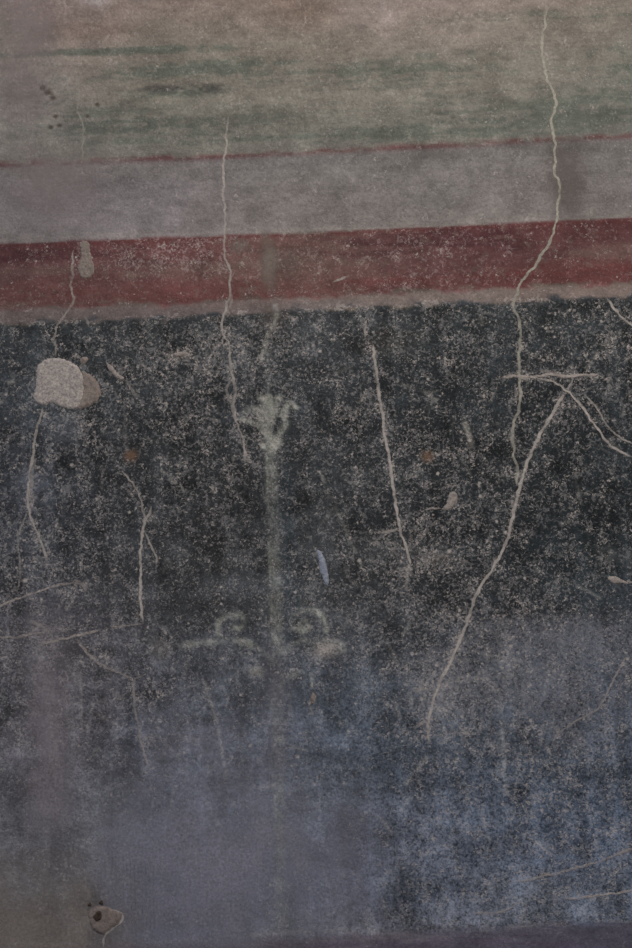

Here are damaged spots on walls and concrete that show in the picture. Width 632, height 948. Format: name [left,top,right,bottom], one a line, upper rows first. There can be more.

crack [20,410,47,558]
crack [55,254,89,349]
crack [221,127,246,456]
crack [364,328,411,564]
crack [427,12,632,741]